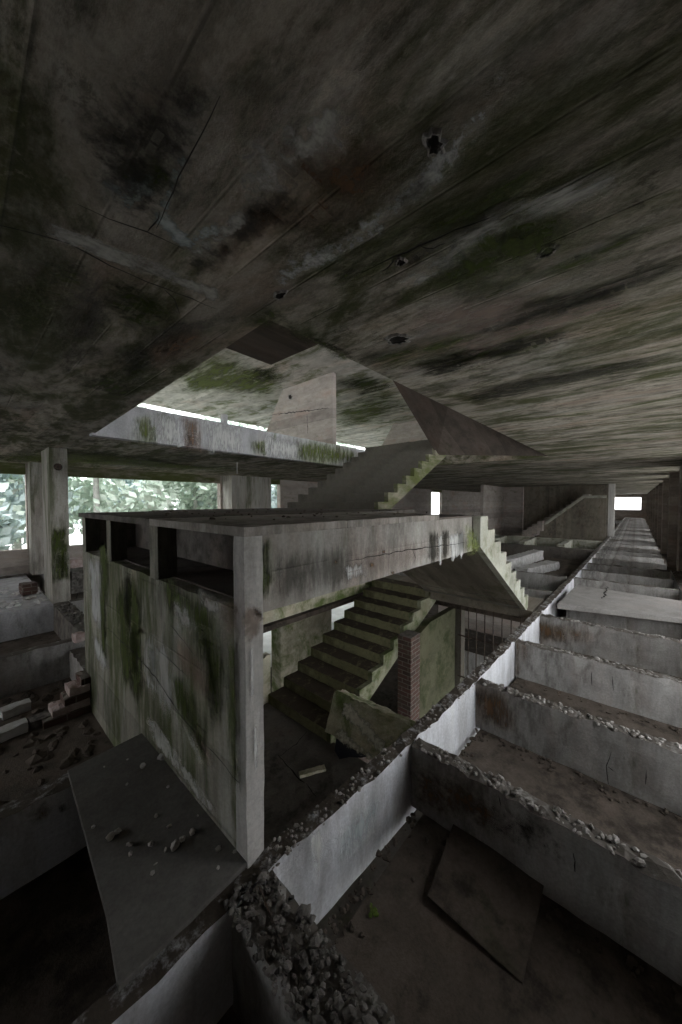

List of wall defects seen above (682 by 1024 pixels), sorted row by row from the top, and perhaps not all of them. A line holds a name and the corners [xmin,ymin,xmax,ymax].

spalling [421,127,449,157]
crack [77,96,220,249]
damp [279,165,611,283]
spalling [384,333,414,346]
damp [377,264,682,376]
damp [340,376,391,395]
damp [473,359,649,402]
damp [206,422,297,459]
crack [351,542,463,561]
damp [429,531,463,564]
damp [89,561,102,626]
damp [124,578,215,756]